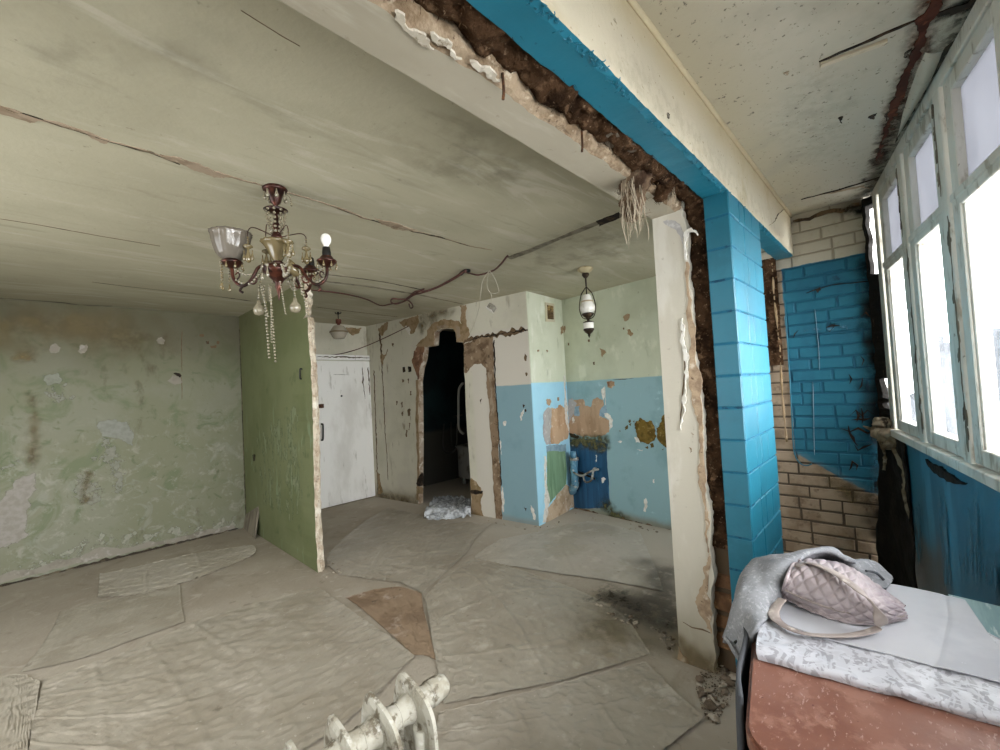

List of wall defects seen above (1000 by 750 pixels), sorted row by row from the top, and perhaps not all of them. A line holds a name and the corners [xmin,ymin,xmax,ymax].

peeling [395,9,500,83]
peeling [526,0,746,208]
crack [819,20,915,62]
rust [873,0,976,166]
crack [0,106,262,186]
crack [288,192,490,250]
spalling [396,305,470,500]
peeling [524,376,622,523]
spalling [663,220,713,634]
peeling [0,473,37,548]
spalling [470,478,483,516]